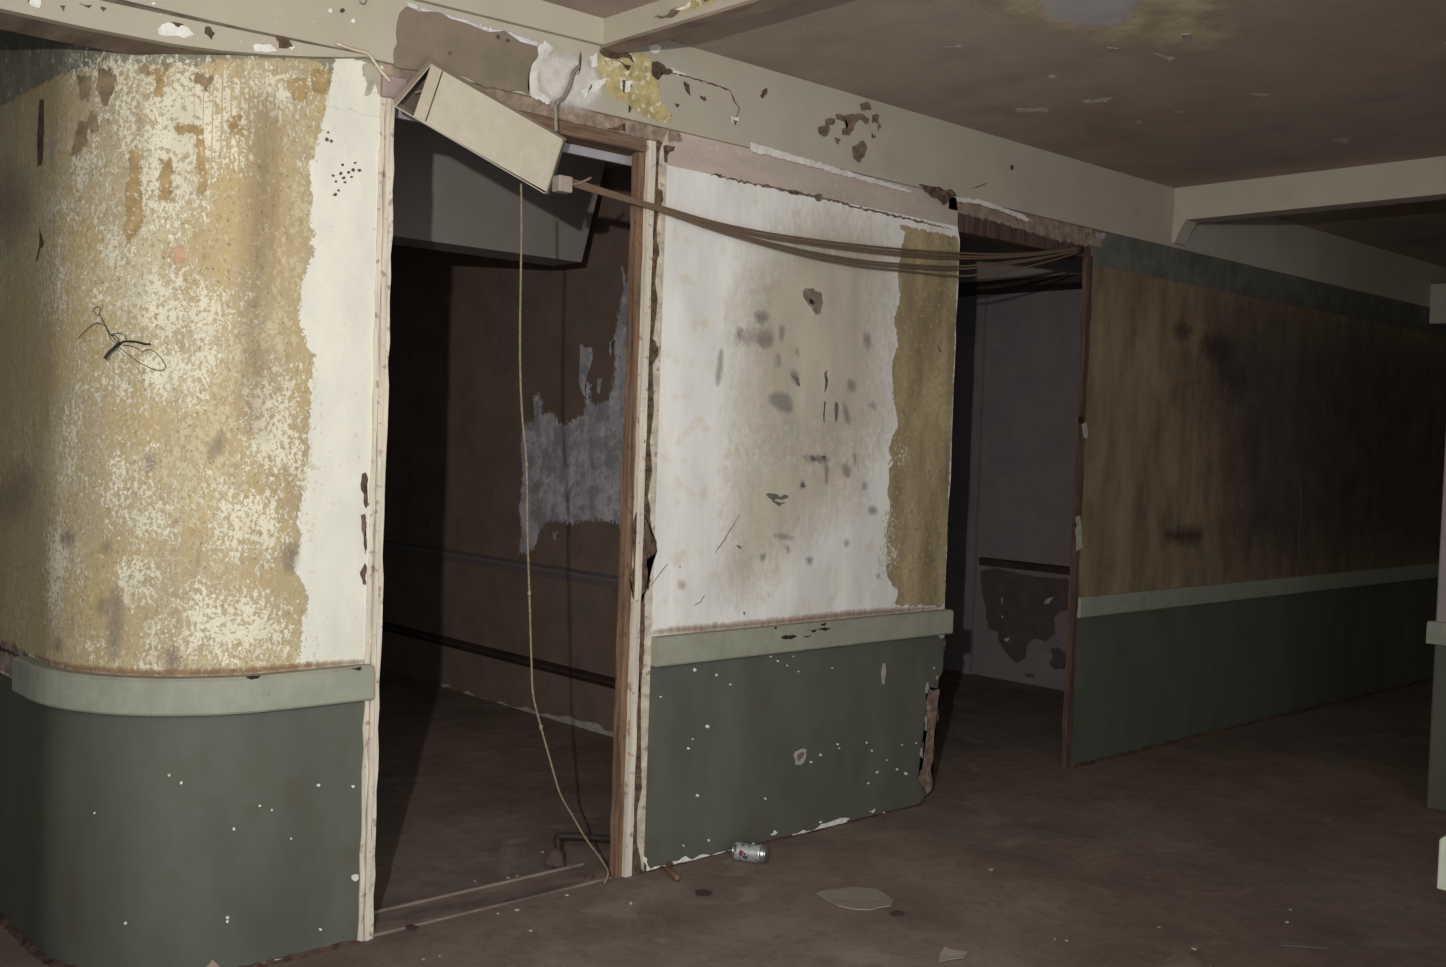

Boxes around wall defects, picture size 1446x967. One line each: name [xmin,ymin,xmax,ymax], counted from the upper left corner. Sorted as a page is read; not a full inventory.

peeling [655,0,723,19]
leakage [989,0,1231,51]
peeling [818,102,881,163]
peeling [0,6,707,680]
peeling [823,370,838,422]
peeling [878,225,959,607]
peeling [766,482,806,506]
peeling [980,568,1069,678]
flaking render [866,667,940,795]